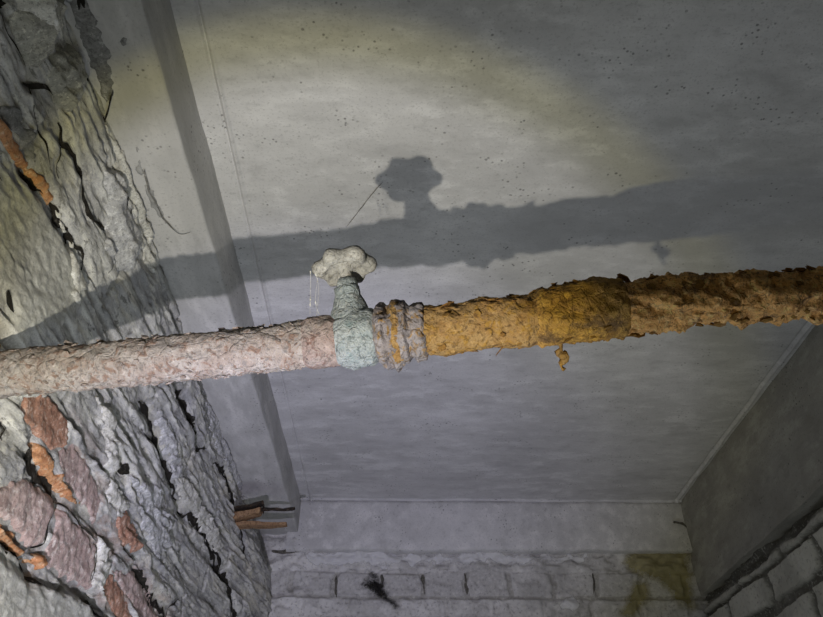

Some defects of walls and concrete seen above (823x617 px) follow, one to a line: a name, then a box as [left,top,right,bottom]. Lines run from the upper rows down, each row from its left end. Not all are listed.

spalling [65,0,114,114]
spalling [0,106,88,305]
flaking render [104,124,157,273]
peeling [218,319,303,336]
spalling [0,381,173,617]
flaking render [153,410,224,554]
flaking render [111,361,288,495]
damp [621,553,693,616]